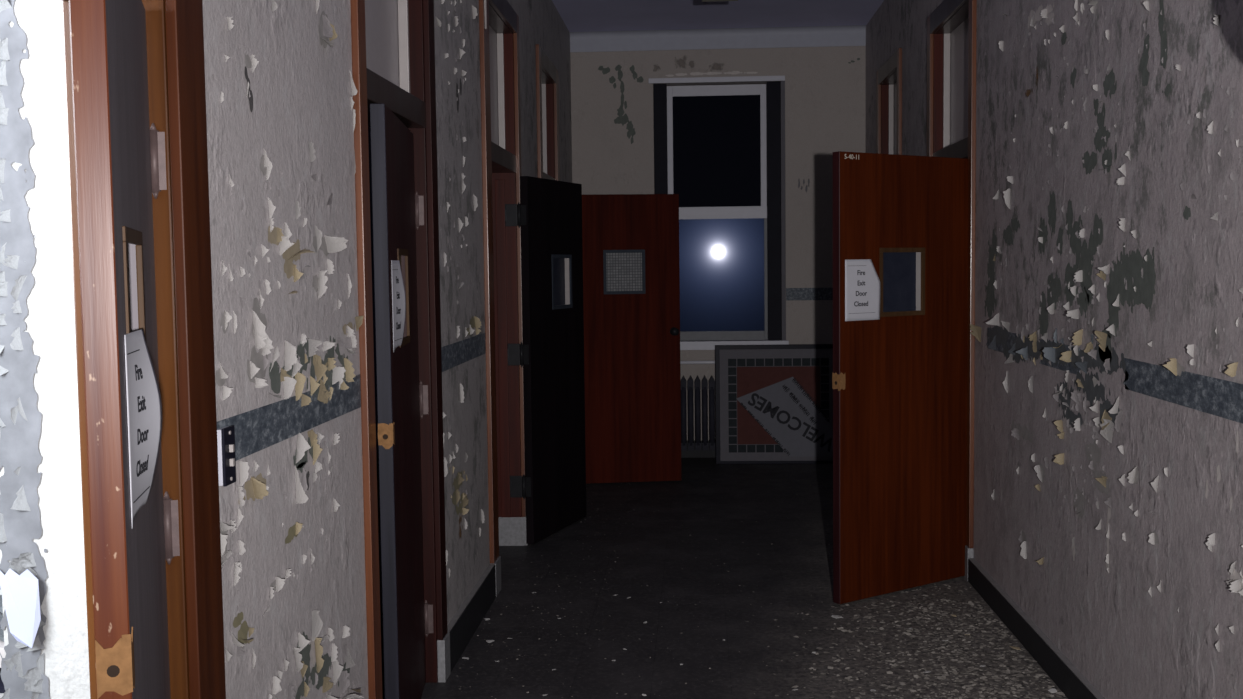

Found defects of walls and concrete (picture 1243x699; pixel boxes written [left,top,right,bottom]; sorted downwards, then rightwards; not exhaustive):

spalling [350,71,358,132]
peeling [436,0,478,304]
peeling [0,0,50,699]
peeling [215,362,233,400]
peeling [218,142,364,407]
peeling [970,110,1168,541]
peeling [1163,317,1239,377]
peeling [293,429,340,512]
peeling [443,432,485,537]
peeling [220,461,332,669]
peeling [1226,545,1243,598]
peeling [269,610,364,699]